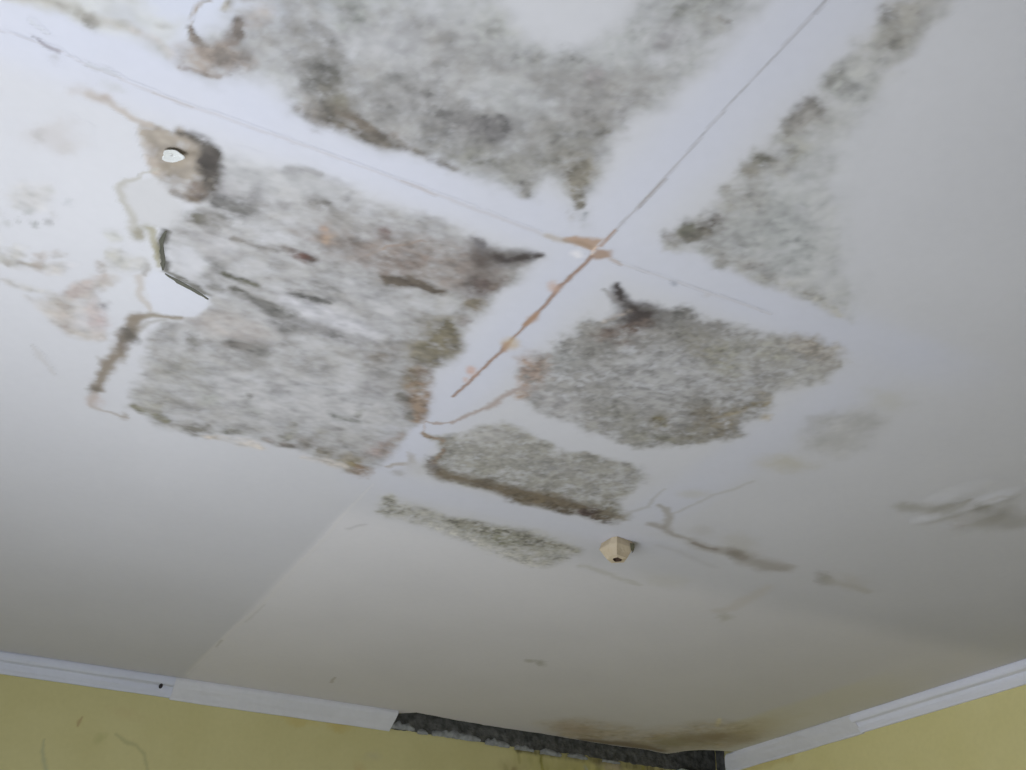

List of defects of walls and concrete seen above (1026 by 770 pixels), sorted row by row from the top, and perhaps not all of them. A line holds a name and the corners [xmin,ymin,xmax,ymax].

leakage [0,0,963,528]
crack [602,0,831,317]
leakage [343,491,698,593]
spalling [391,712,725,770]